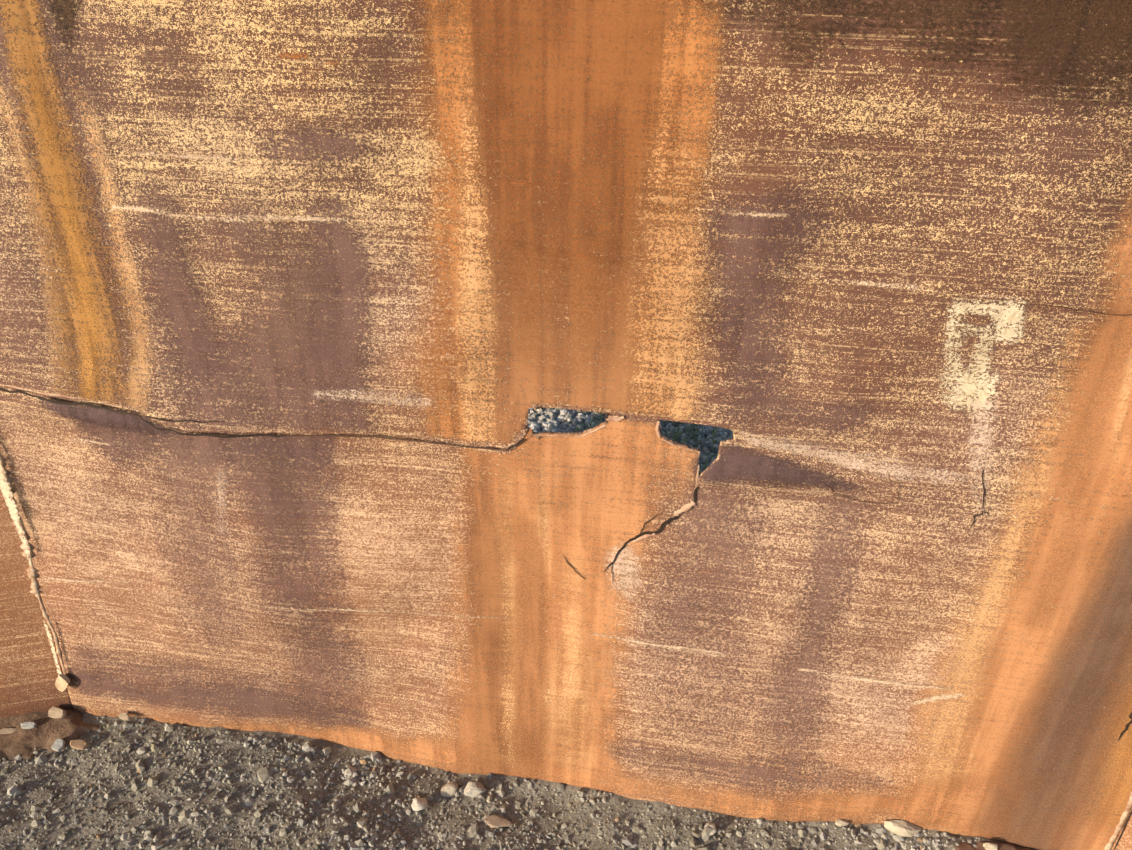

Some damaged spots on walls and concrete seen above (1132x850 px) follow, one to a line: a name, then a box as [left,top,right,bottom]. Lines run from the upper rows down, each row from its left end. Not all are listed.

corrosion [0,0,158,417]
water stain [54,182,377,740]
crack [0,384,525,451]
corrosion [416,0,722,446]
crack [563,464,700,583]
corrosion [223,203,1132,850]
water stain [611,488,891,820]
water stain [700,188,876,432]
crack [1114,811,1132,850]
crack [1118,712,1132,741]